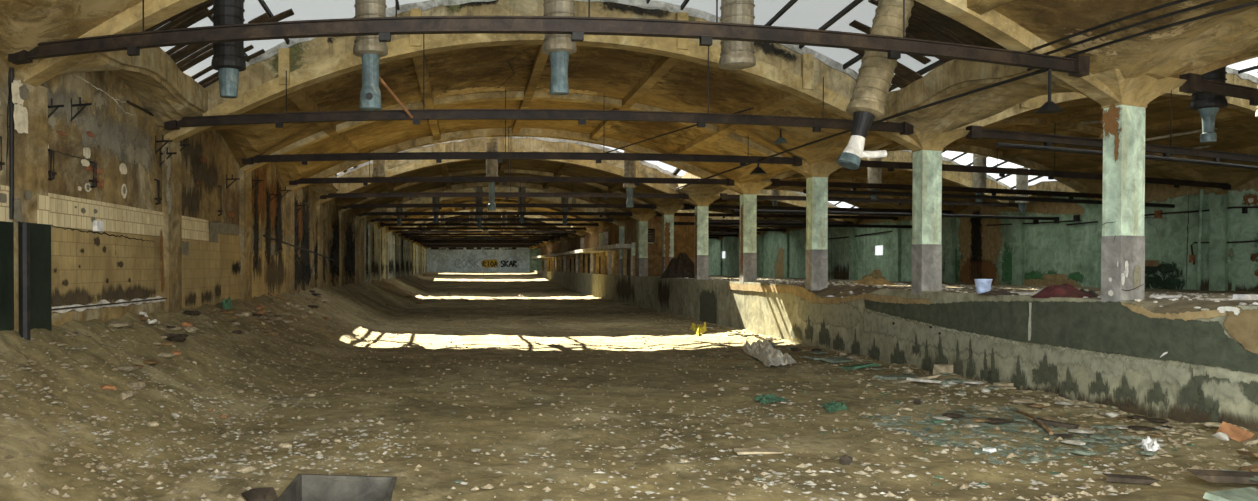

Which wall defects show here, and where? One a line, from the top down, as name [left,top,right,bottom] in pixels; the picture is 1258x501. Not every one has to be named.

spalling [0,80,29,134]
leakage [52,285,156,313]
leakage [232,181,414,294]
peeling [1001,242,1081,287]
leakage [1145,262,1185,290]
peeling [1108,261,1258,354]
leakage [1228,281,1258,292]
leakage [790,300,1258,432]